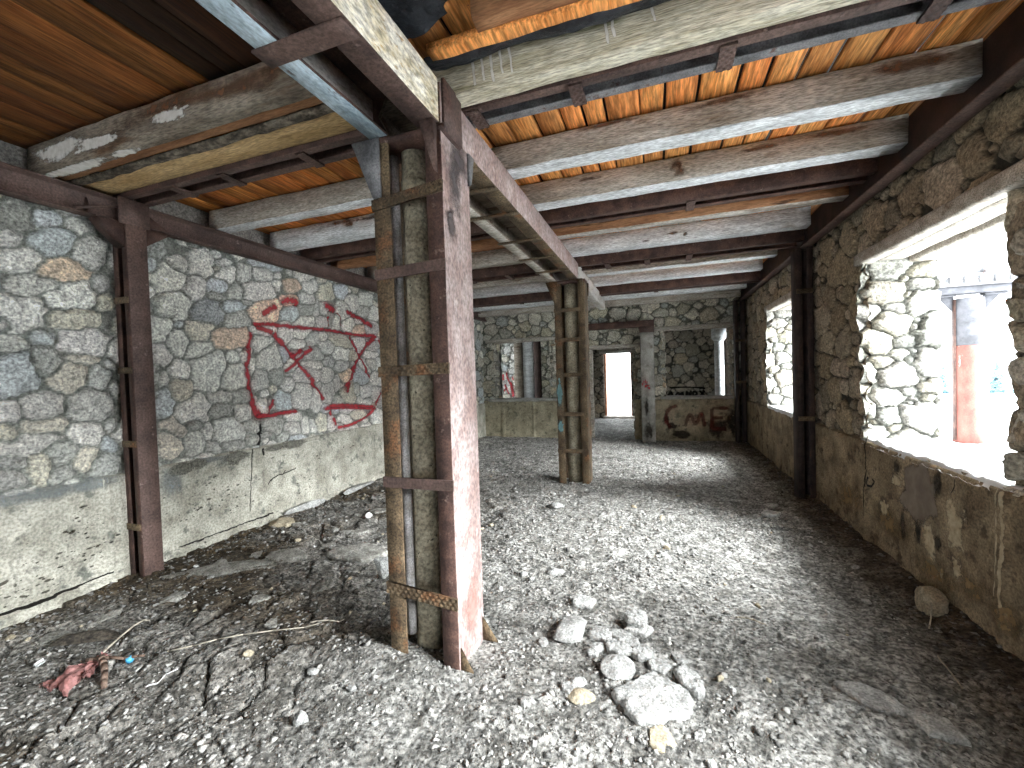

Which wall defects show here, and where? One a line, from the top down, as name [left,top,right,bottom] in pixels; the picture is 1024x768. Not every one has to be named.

crack [180,424,296,547]
crack [863,438,875,508]
damp [993,489,1005,608]
crack [0,571,114,616]
rust [464,581,478,627]